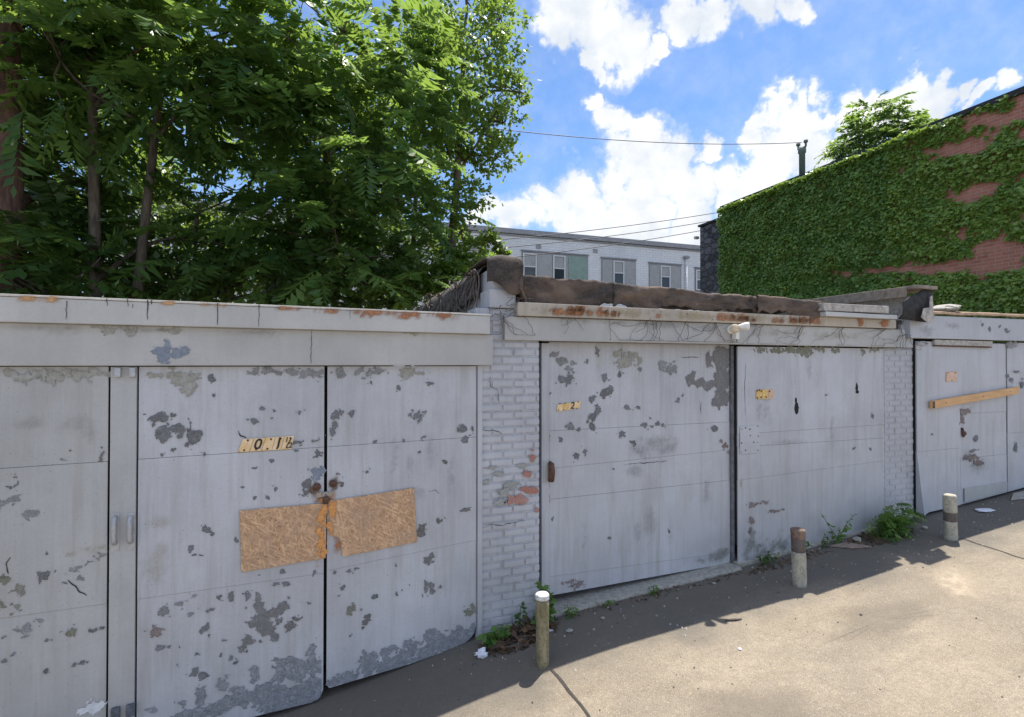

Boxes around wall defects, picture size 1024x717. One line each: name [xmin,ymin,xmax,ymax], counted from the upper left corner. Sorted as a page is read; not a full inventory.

corrosion [355,310,420,319]
corrosion [550,306,620,317]
peeling [143,327,216,397]
peeling [559,348,643,442]
peeling [658,344,729,410]
peeling [143,411,206,457]
peeling [482,448,541,513]
peeling [963,435,984,467]
corrosion [309,478,341,559]
peeling [0,574,43,640]
peeling [144,569,478,717]